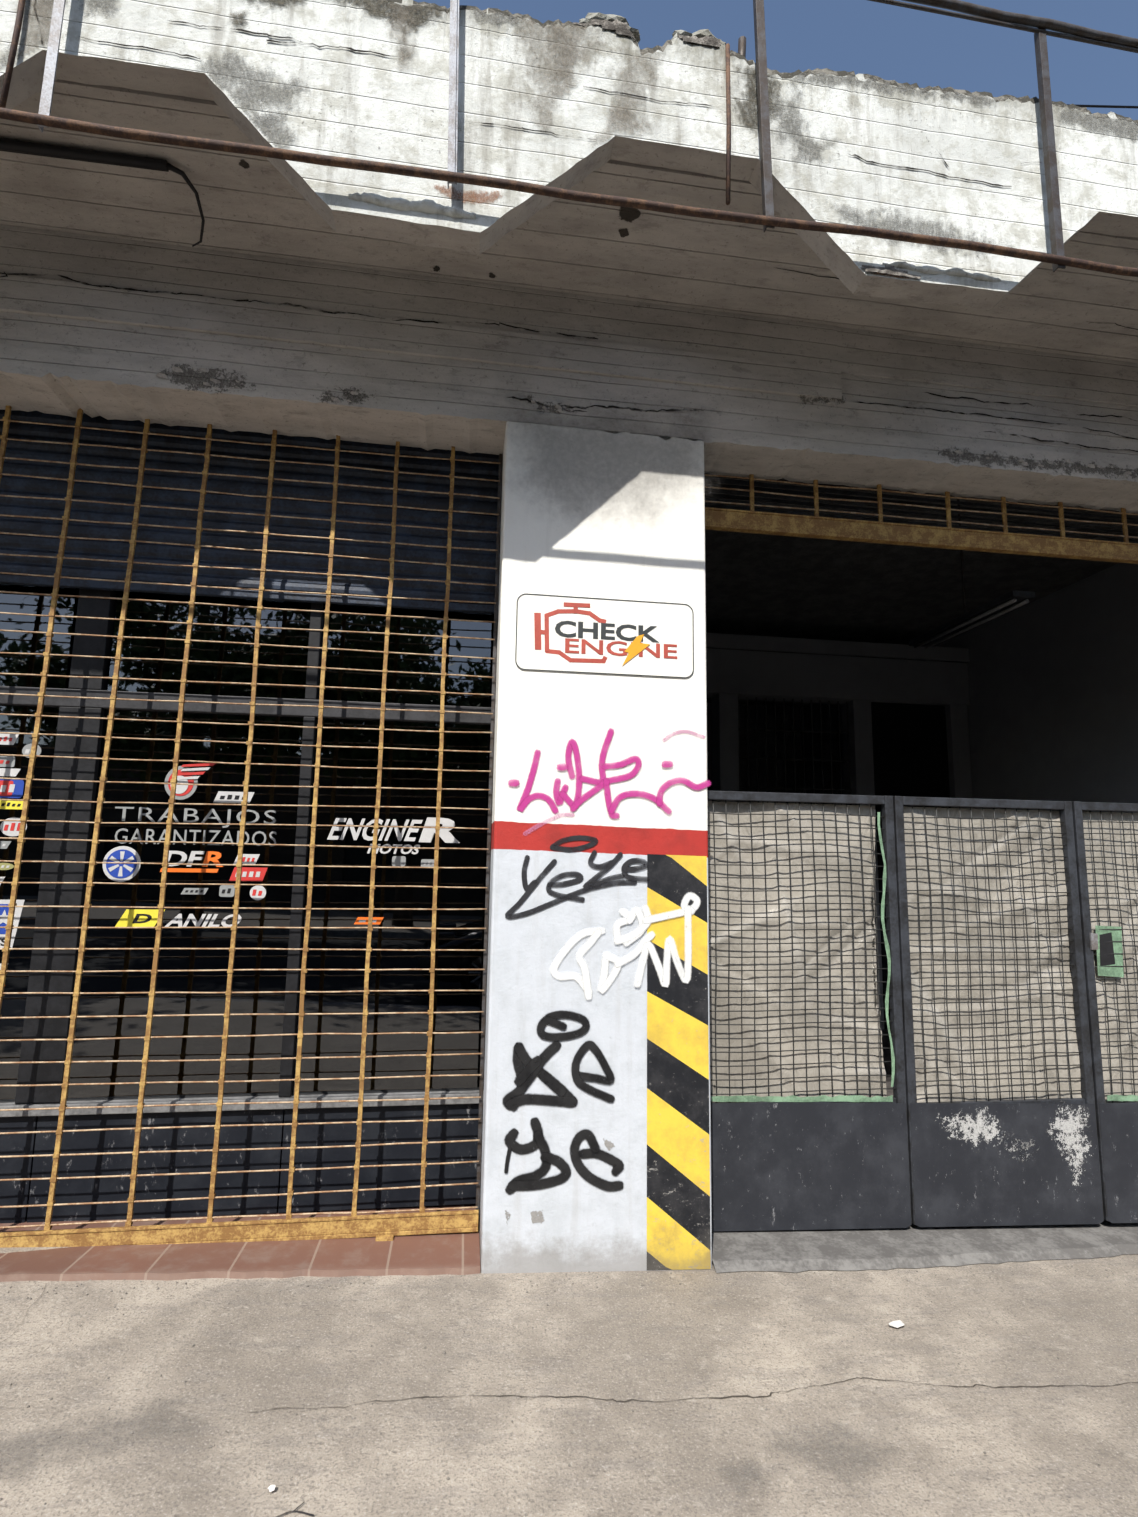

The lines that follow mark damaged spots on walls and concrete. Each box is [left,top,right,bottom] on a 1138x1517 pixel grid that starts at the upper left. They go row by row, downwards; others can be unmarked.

spalling [573,12,640,43]
damp [470,10,599,124]
crack [369,1377,899,1402]
crack [945,1381,1138,1389]